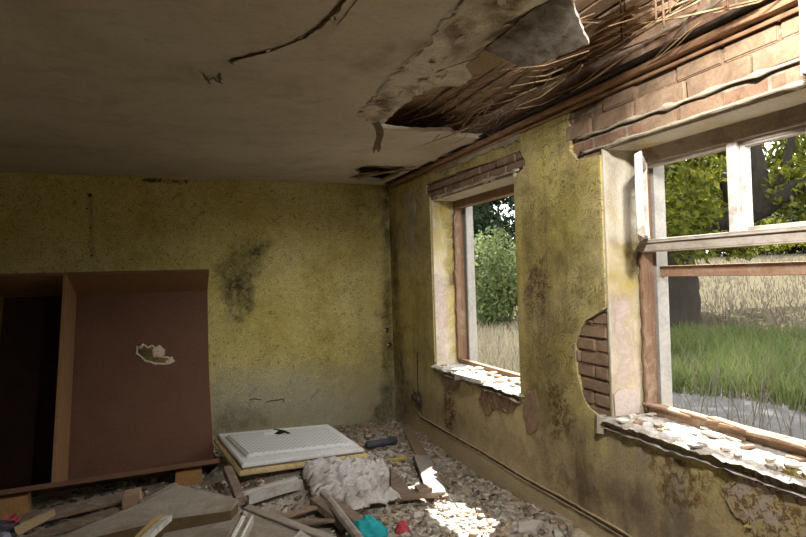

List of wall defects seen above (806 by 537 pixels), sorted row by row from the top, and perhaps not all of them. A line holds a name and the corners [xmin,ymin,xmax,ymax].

crack [199,0,358,84]
peeling [354,0,549,124]
flaking render [426,131,525,198]
flaking render [575,299,640,434]
flaking render [477,382,575,437]